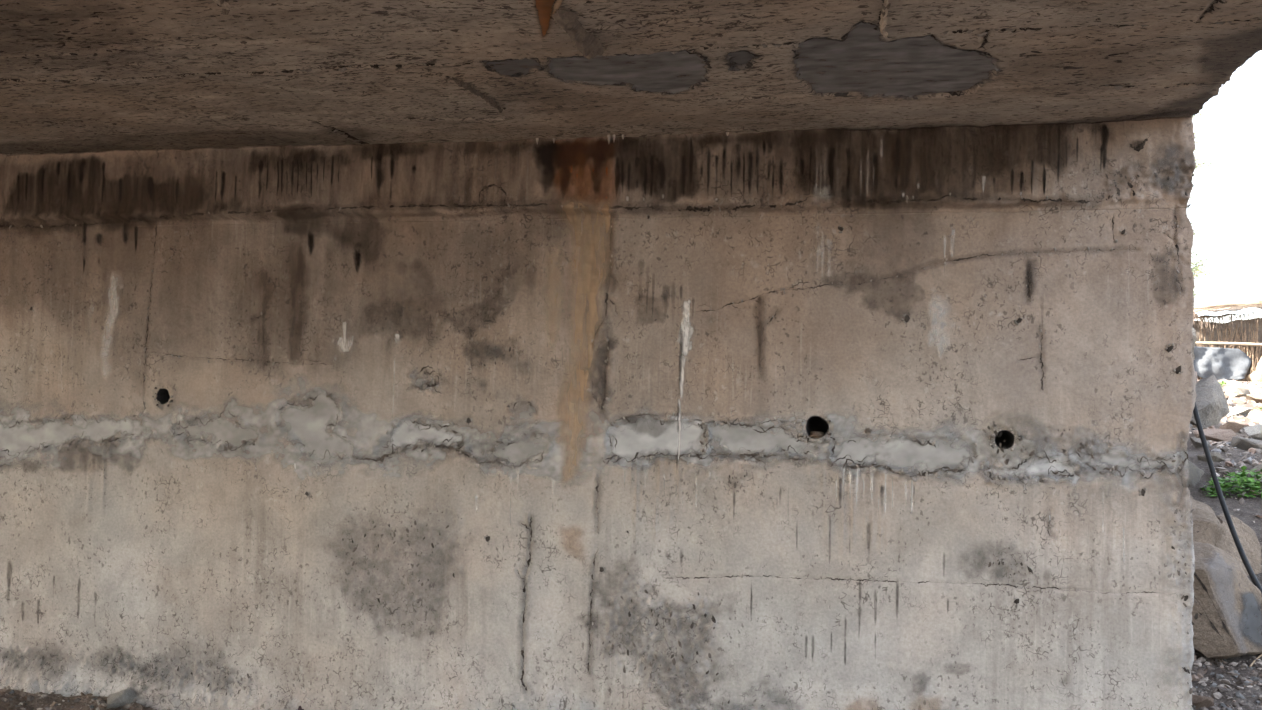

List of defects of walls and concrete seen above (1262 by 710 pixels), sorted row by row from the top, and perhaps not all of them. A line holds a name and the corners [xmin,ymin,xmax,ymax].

peeling [480,50,762,110]
peeling [791,21,1000,99]
damp [7,158,237,250]
damp [252,151,343,196]
damp [362,144,402,196]
damp [536,138,559,192]
rust [554,140,616,202]
crack [0,193,1193,690]